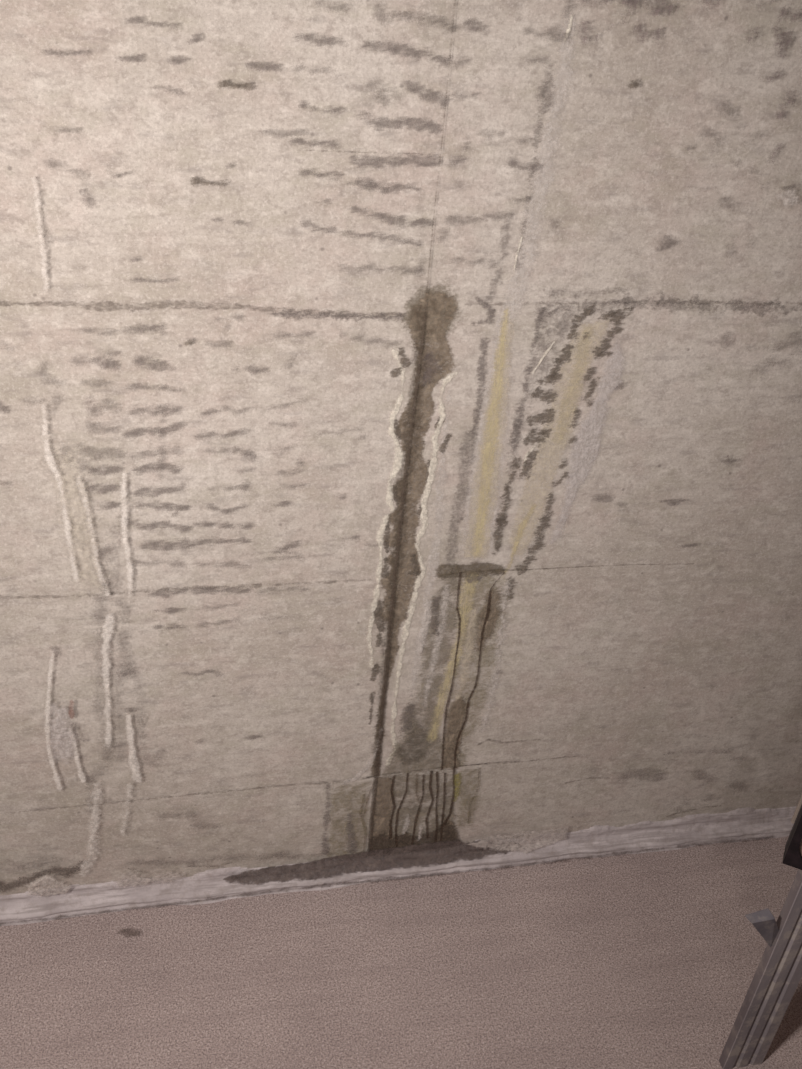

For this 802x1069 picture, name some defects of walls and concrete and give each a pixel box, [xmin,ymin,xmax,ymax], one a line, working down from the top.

damp [153,587,247,629]
crack [368,250,431,851]
damp [224,16,633,885]